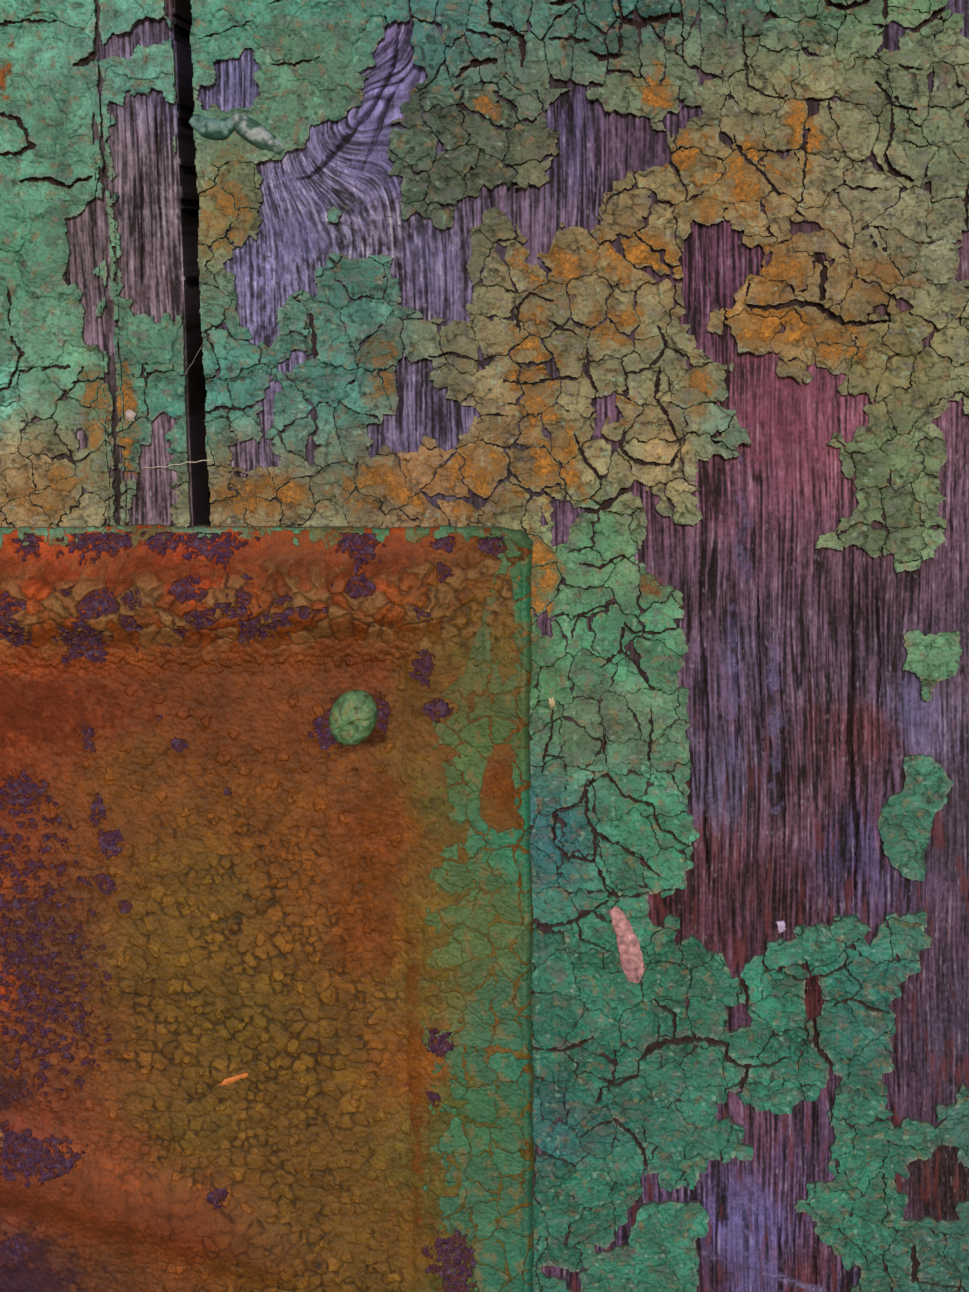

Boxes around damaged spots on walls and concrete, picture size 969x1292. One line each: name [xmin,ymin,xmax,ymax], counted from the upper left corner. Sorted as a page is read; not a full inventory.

crack [456,0,685,78]
crack [0,112,93,189]
peeling [0,0,261,570]
crack [746,252,890,327]
peeling [230,379,283,471]
peeling [367,352,480,458]
crack [437,292,686,514]
peeling [421,586,538,970]
crack [537,545,786,948]
peeling [0,769,133,1110]
peeling [420,948,534,1292]
crack [584,998,784,1167]